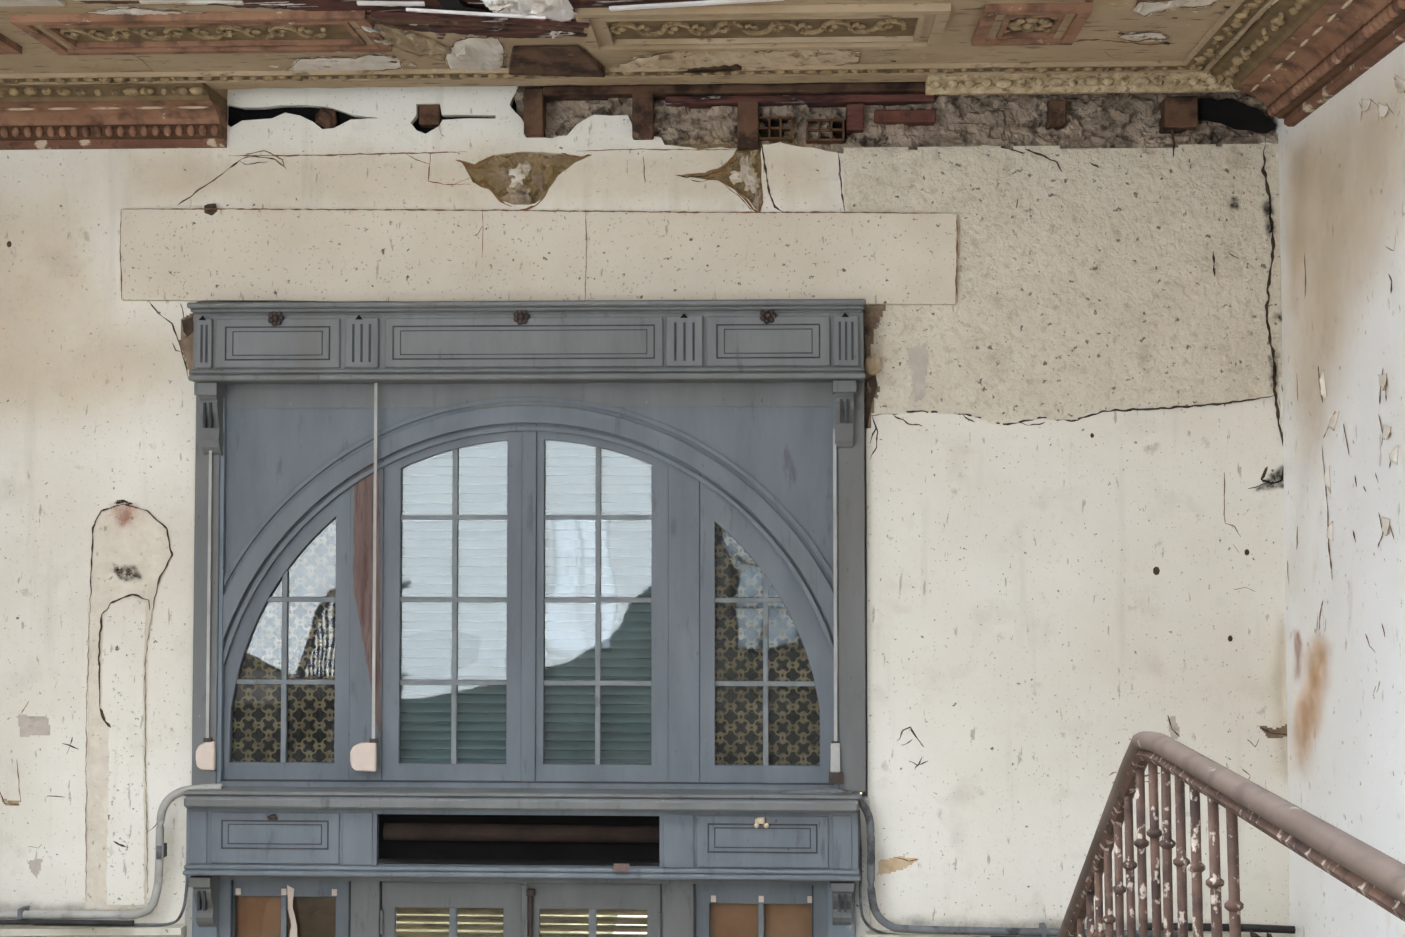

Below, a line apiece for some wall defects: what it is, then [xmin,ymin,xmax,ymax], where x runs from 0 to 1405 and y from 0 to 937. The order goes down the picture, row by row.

spalling [78,0,705,72]
peeling [617,50,862,70]
peeling [1112,0,1230,45]
spalling [228,106,366,129]
spalling [413,106,489,134]
spalling [456,153,591,210]
spalling [684,154,764,212]
crack [160,146,919,297]
crack [120,222,188,376]
crack [870,137,1306,552]
crack [51,500,173,894]